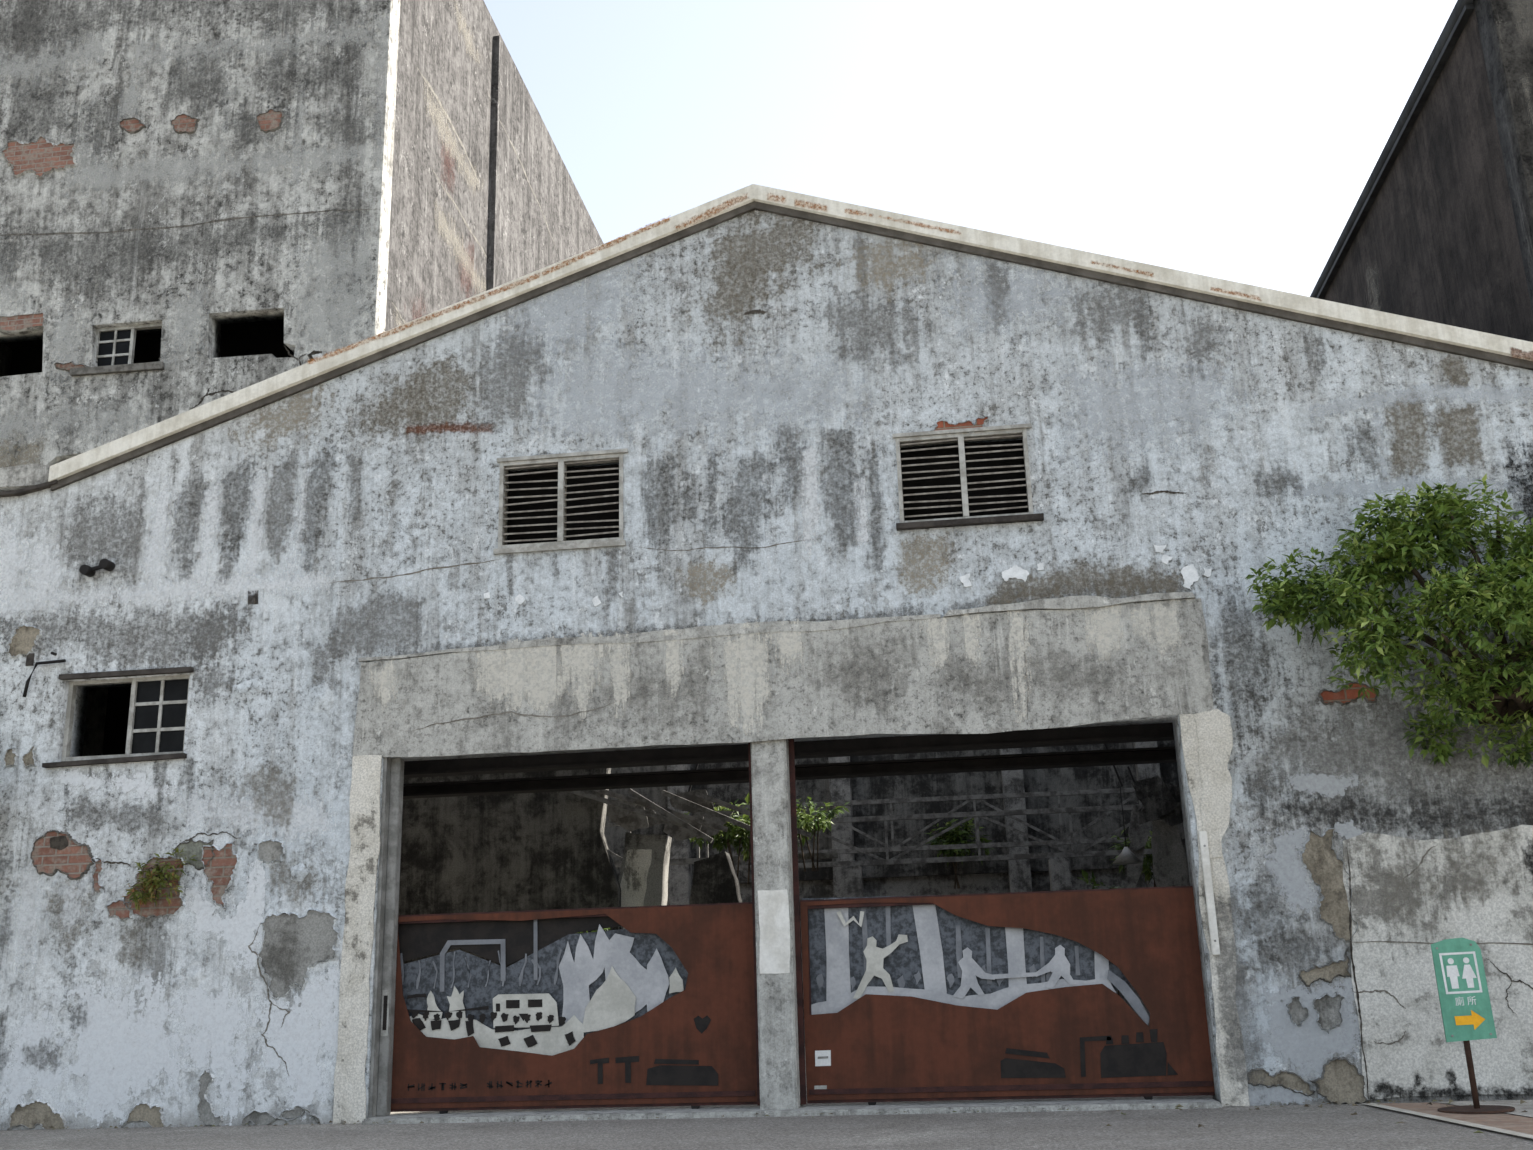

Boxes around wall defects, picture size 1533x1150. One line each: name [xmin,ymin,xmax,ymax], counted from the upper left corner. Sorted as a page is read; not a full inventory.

flaking render [2,135,78,180]
crack [191,388,233,409]
damp [348,204,931,606]
damp [710,533,1189,735]
peeling [1286,768,1364,799]
damp [1212,595,1533,924]
peeling [0,830,341,1130]
crack [248,923,291,1075]
peeling [1247,818,1367,1106]
crack [1347,845,1437,1099]
damp [1367,1071,1533,1102]
crack [1477,942,1533,1014]